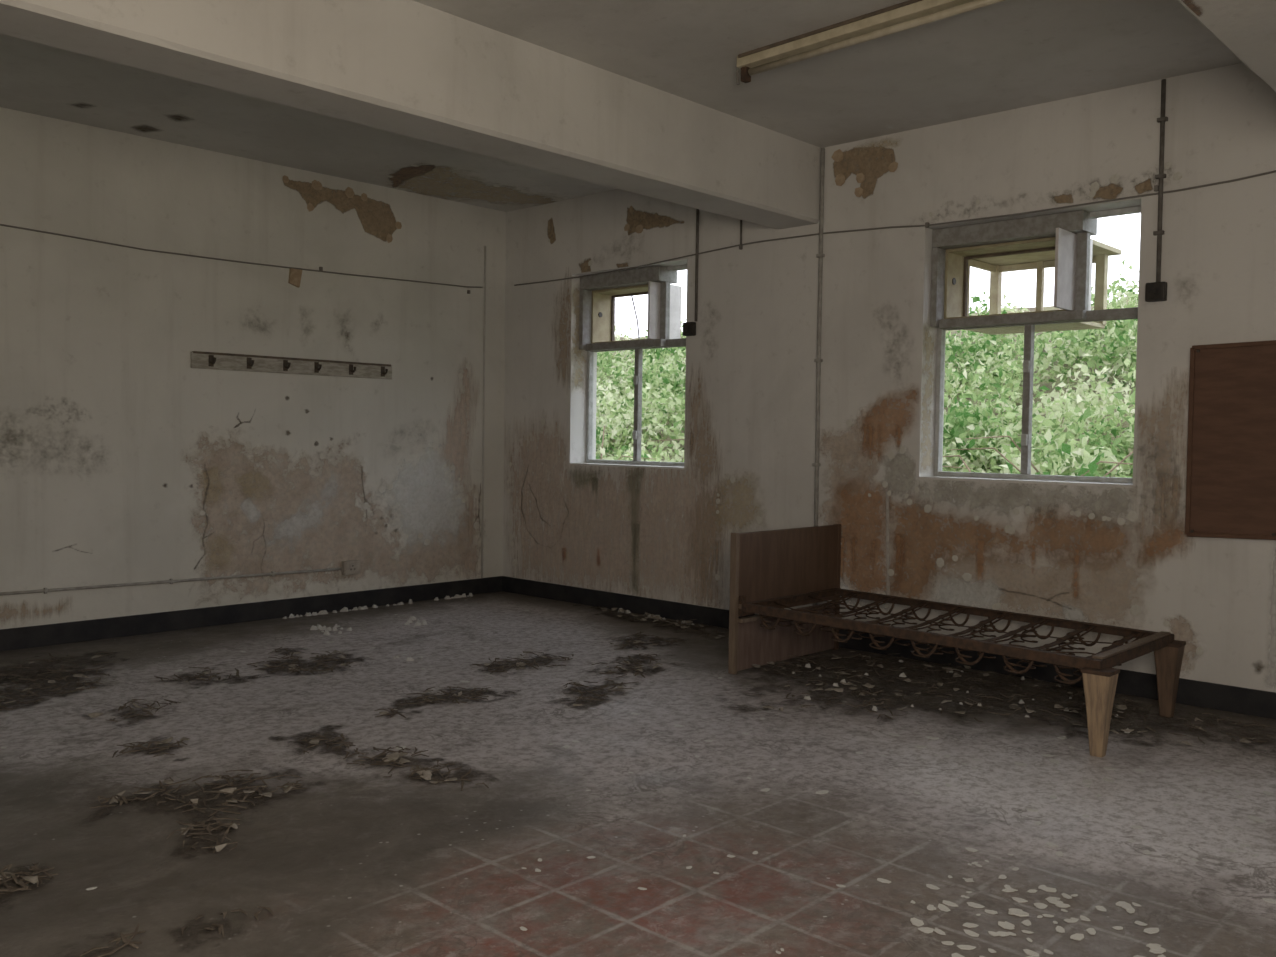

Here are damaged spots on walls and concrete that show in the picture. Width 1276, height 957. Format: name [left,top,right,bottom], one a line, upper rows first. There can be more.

peeling [831,141,898,199]
peeling [283,175,402,243]
peeling [888,499,1129,620]